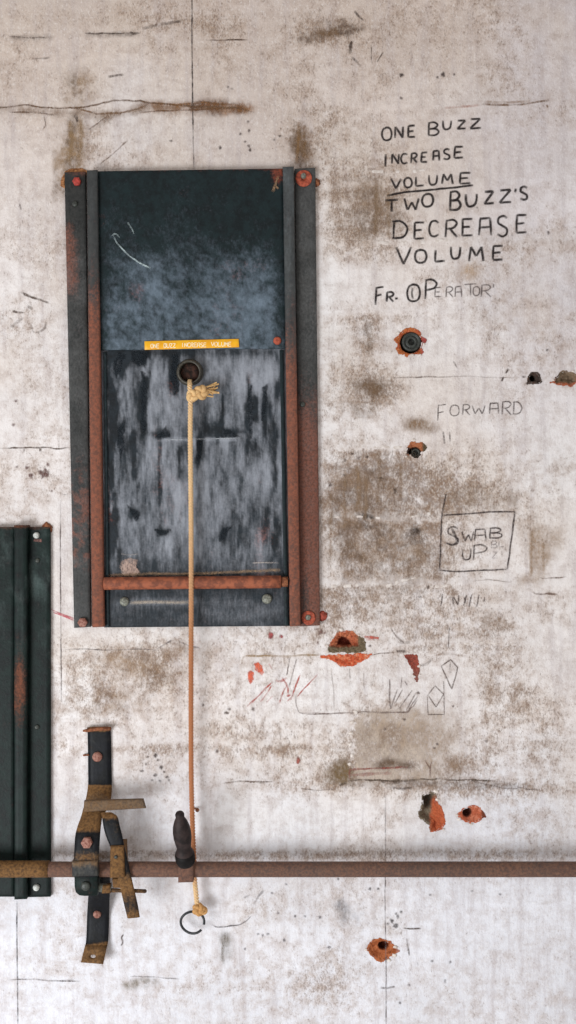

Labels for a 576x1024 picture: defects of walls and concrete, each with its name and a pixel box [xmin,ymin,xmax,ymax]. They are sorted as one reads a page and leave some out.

crack [0,0,244,125]
rust [175,101,251,114]
spalling [394,327,427,357]
spalling [523,370,576,387]
spalling [404,438,427,458]
spalling [316,628,379,667]
peeling [248,663,264,684]
peeling [404,654,421,694]
peeling [348,710,486,832]
spalling [365,938,400,962]